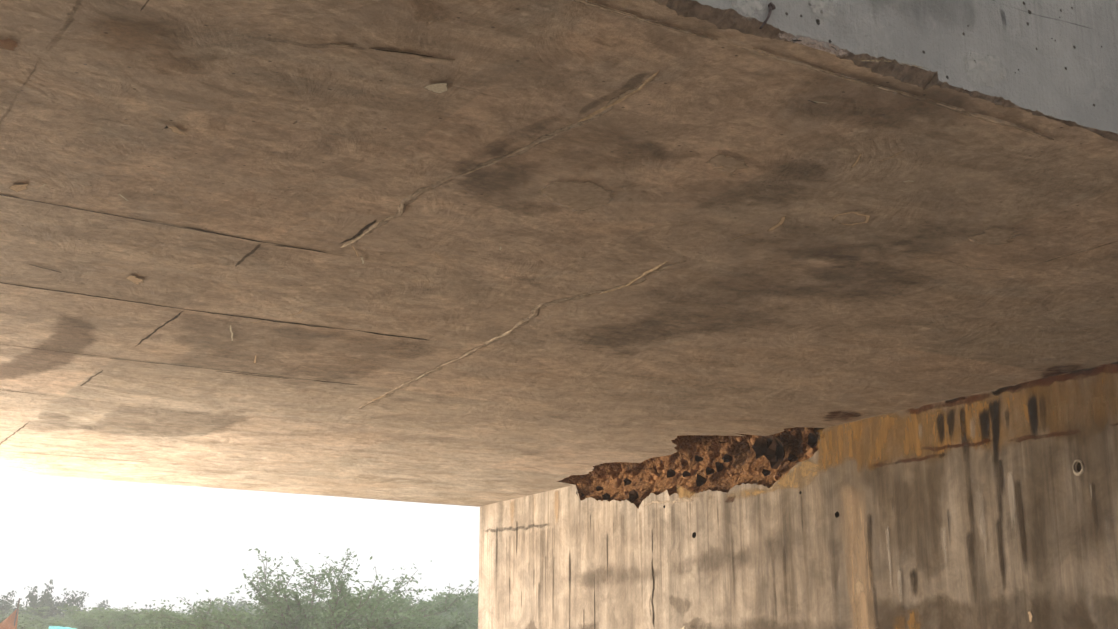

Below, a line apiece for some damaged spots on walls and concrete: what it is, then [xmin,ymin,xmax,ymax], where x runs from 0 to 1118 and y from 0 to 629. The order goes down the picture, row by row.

crack [341,71,659,248]
spalling [556,427,824,508]